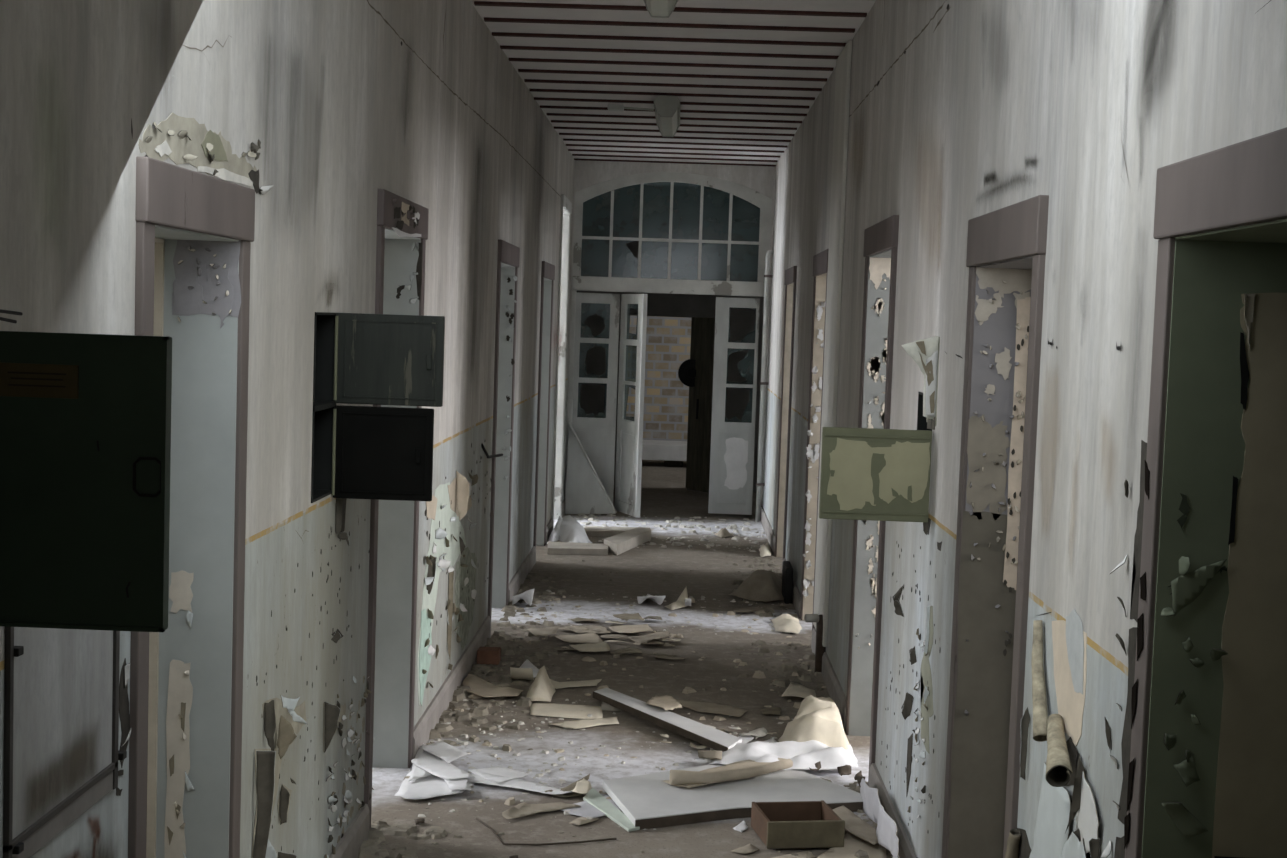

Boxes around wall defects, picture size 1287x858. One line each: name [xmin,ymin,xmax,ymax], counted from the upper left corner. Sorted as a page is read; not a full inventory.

flaking render [138,112,274,195]
peeling [505,276,517,343]
peeling [816,302,825,348]
peeling [869,257,891,316]
peeling [297,498,360,660]
peeling [417,441,508,706]
peeling [802,366,822,598]
peeling [863,266,1147,858]
peeling [251,666,374,858]